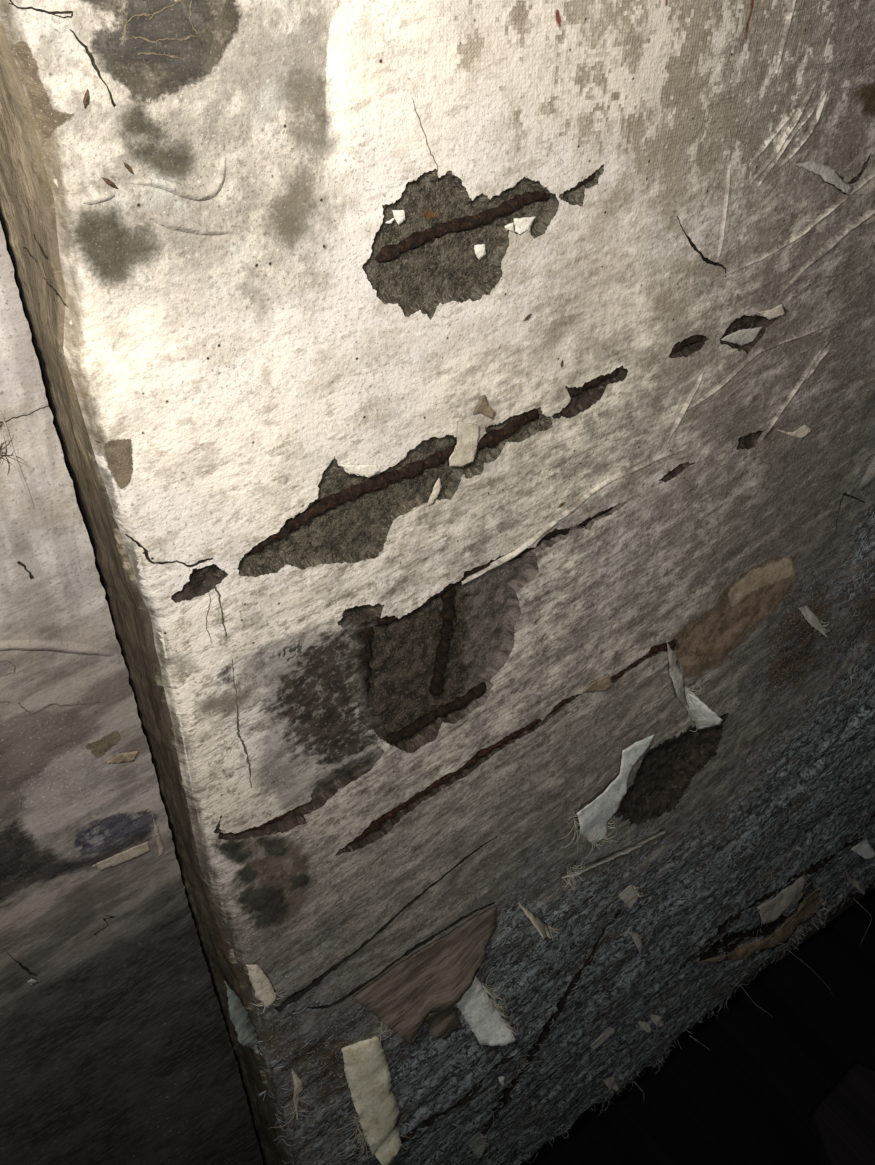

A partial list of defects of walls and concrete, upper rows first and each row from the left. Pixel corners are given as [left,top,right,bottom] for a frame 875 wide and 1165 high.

crack [8,0,116,107]
leakage [123,105,192,177]
leakage [286,76,325,152]
leakage [267,175,313,243]
spalling [362,164,604,320]
spalling [669,304,789,358]
spalling [171,365,628,603]
spalling [659,462,695,483]
spalling [737,425,811,450]
peeling [799,605,828,638]
spalling [214,500,629,840]
flaking render [335,556,796,891]